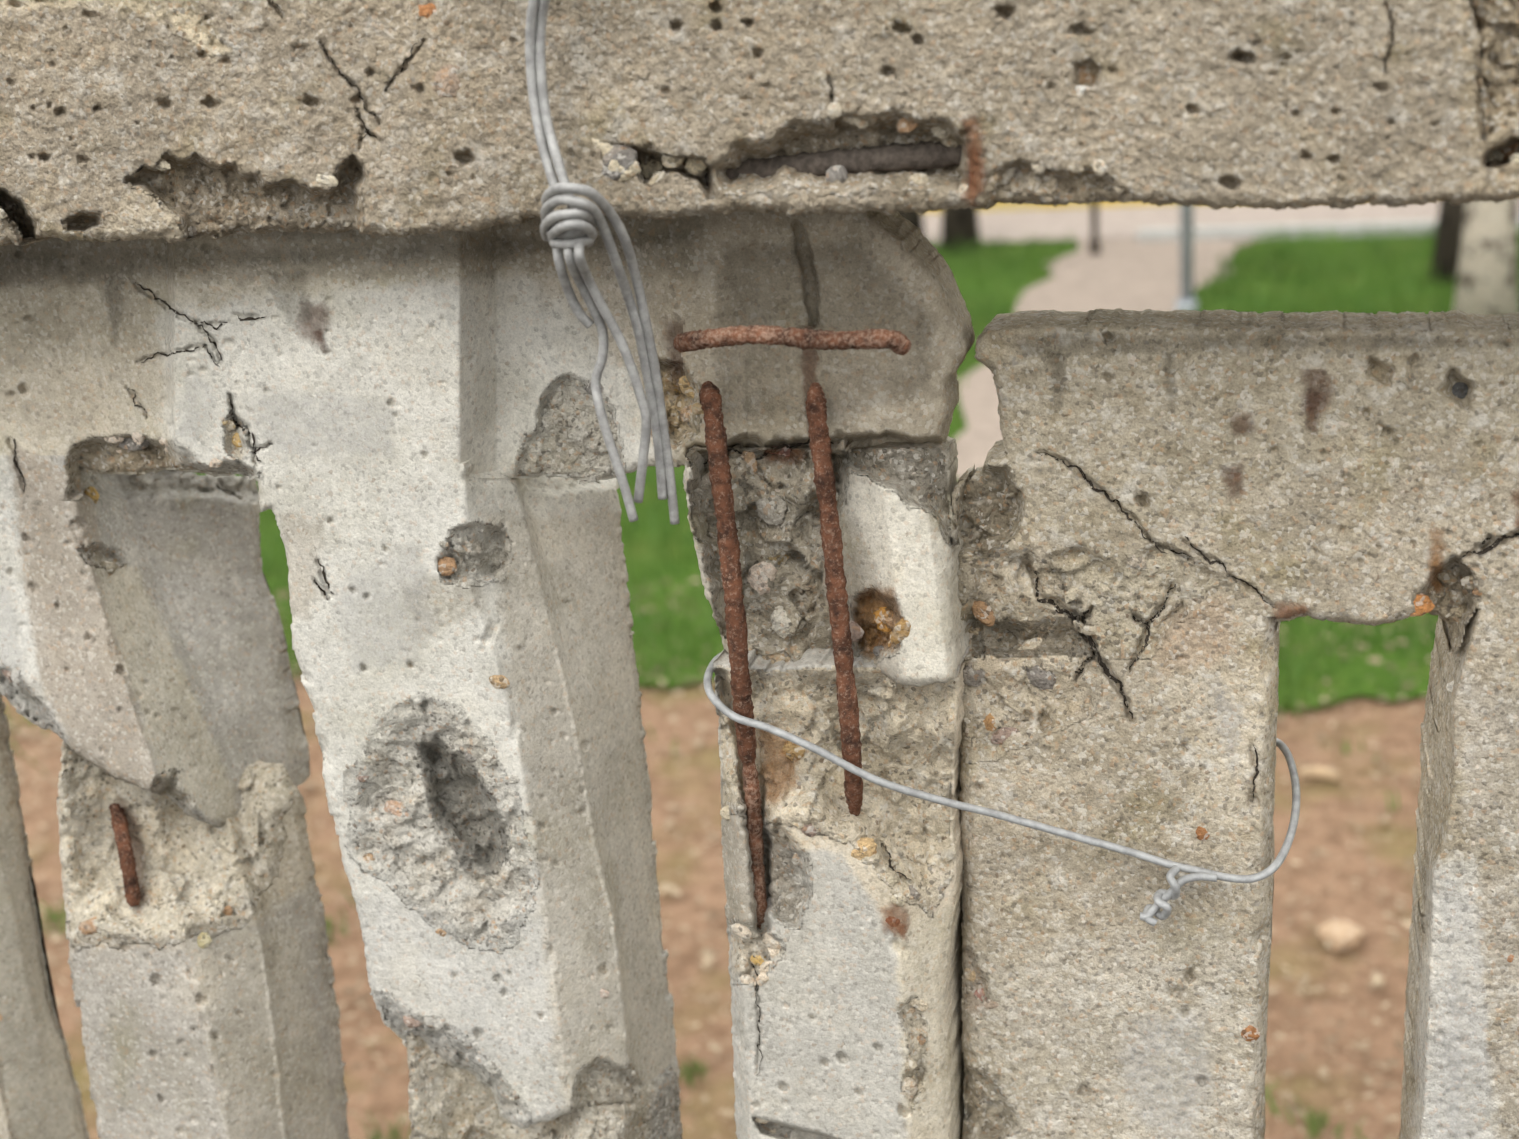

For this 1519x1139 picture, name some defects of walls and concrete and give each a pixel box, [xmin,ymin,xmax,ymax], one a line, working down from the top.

crack [319,40,419,150]
spalling [591,102,1133,207]
corrosion [965,121,983,202]
crack [128,282,272,461]
corrosion [856,589,897,648]
spalling [644,325,1240,989]
crack [1033,453,1275,719]
crack [1463,533,1519,557]
spalling [0,666,296,952]
spalling [343,691,541,955]
corrosion [761,732,794,801]
corrosion [885,905,907,935]